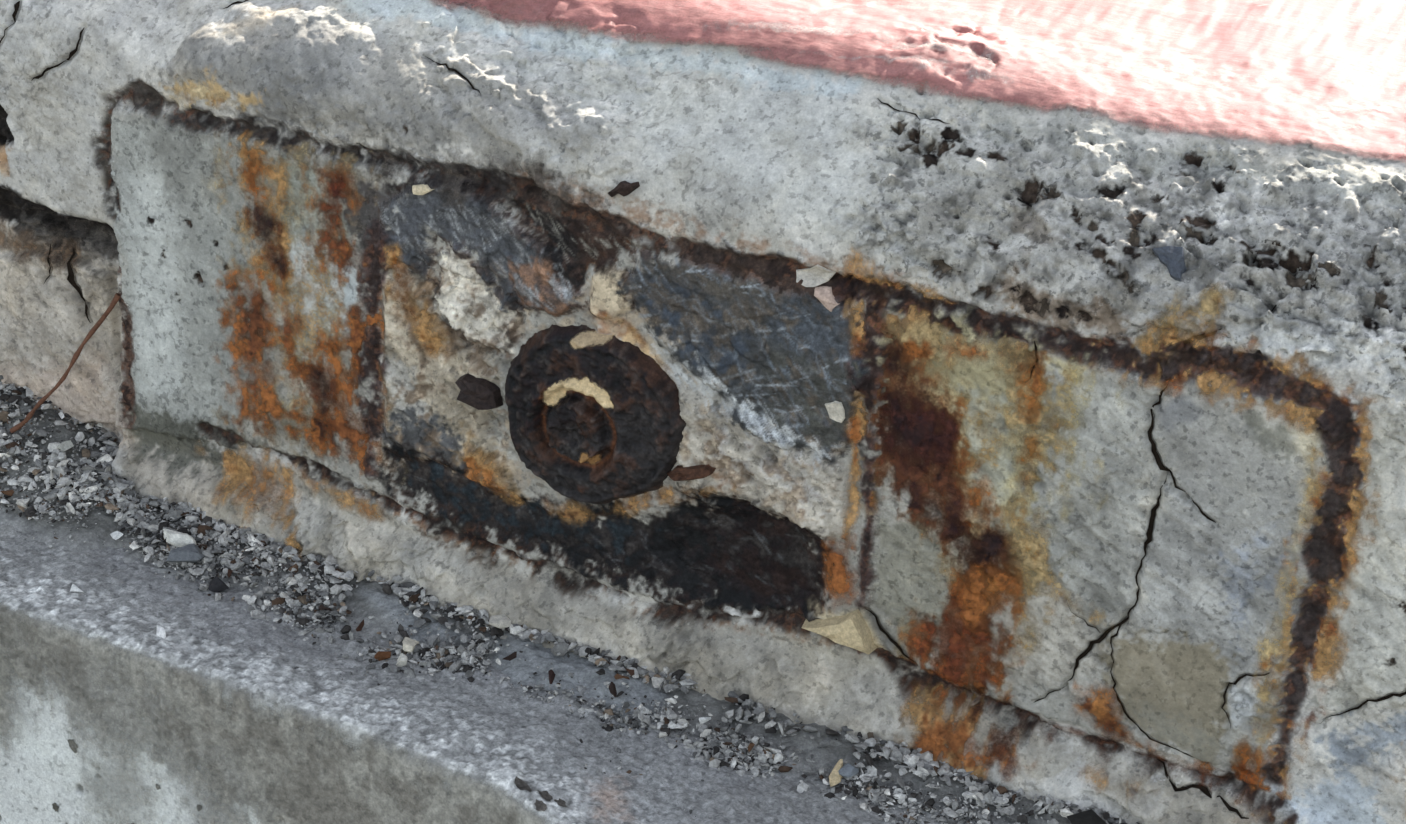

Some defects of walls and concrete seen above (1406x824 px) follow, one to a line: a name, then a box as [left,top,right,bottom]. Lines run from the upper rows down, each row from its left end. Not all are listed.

crack [0,1,20,43]
crack [31,28,84,81]
spalling [0,105,14,145]
spalling [0,184,119,259]
peeling [796,264,840,312]
corrosion [216,130,443,561]
peeling [825,401,845,423]
corrosion [463,451,522,504]
corrosion [823,249,1371,799]
crack [1033,386,1249,819]
damp [0,603,549,824]
crack [1319,692,1406,724]